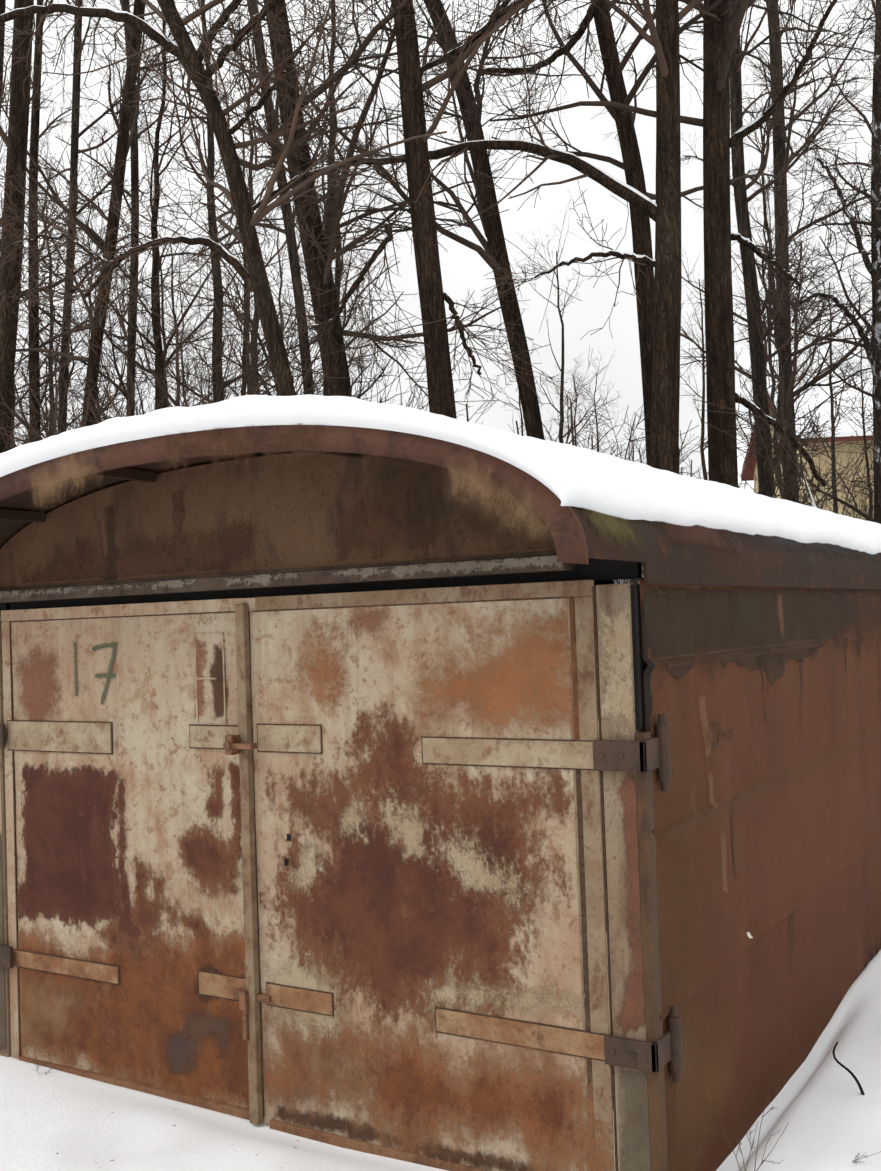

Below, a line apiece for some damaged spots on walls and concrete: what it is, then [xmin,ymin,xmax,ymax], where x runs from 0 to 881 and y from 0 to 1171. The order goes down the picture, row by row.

rust [301,627,345,709]
rust [417,596,580,738]
rust [18,929,249,1109]
rust [262,1013,612,1171]